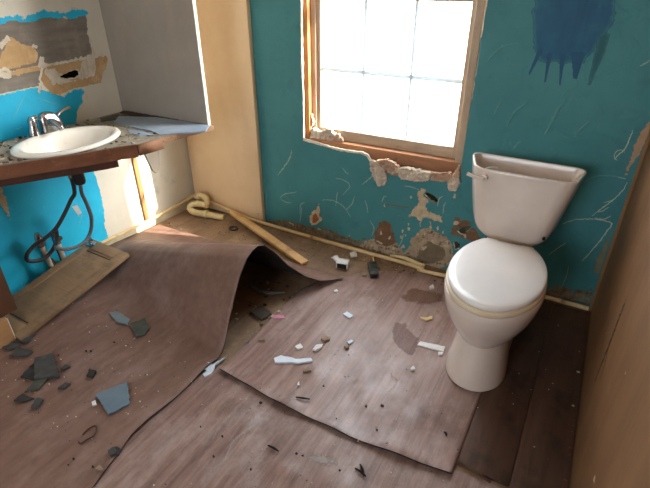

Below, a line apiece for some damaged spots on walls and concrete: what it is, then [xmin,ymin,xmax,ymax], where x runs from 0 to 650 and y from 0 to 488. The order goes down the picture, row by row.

spalling [41,54,108,95]
spalling [300,0,462,191]
peeling [625,121,650,175]
peeling [302,204,322,230]
spalling [359,217,481,269]